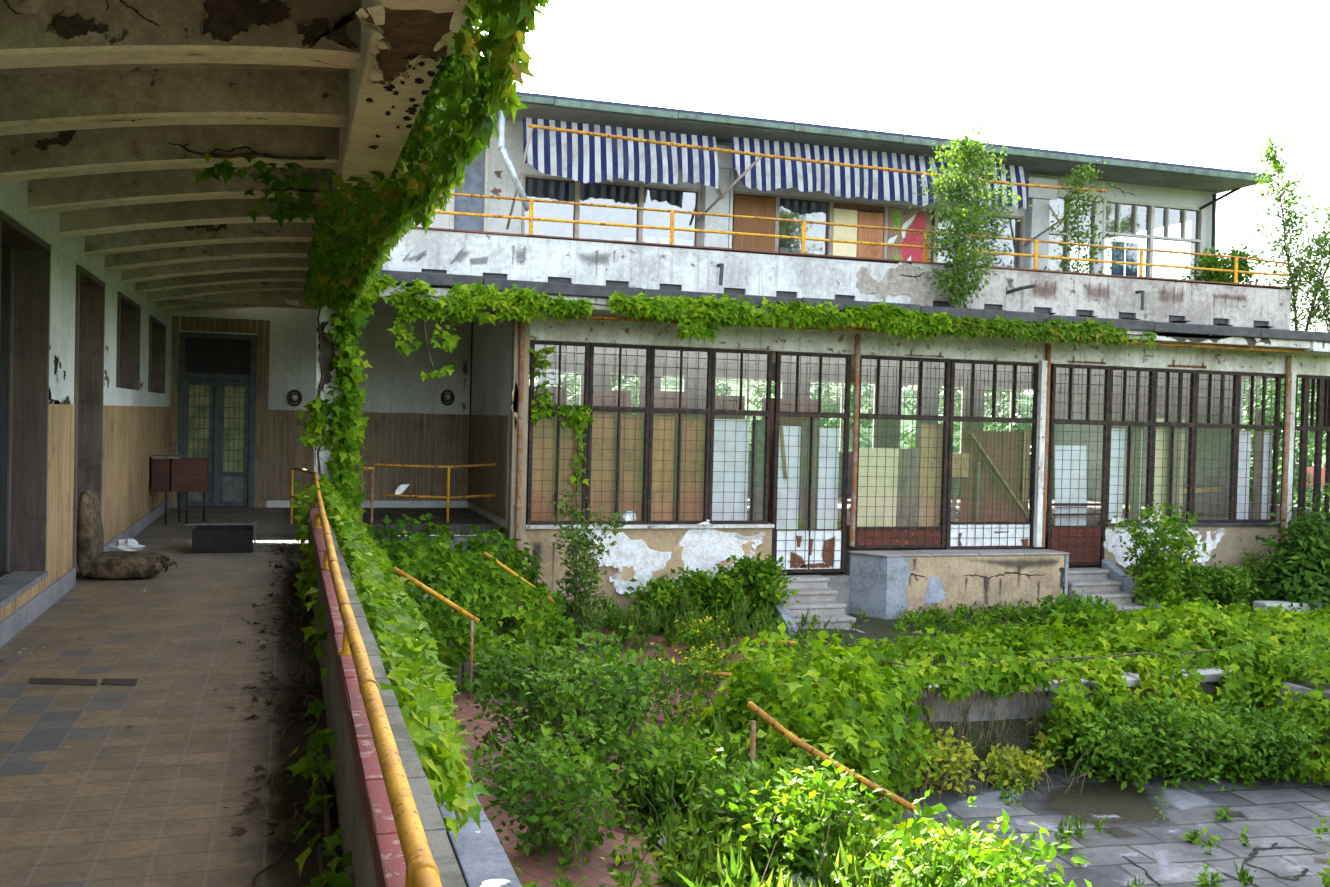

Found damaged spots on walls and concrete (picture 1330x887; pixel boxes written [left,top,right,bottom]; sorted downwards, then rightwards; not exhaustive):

flaking render [50,13,110,41]
spalling [200,0,468,129]
peeling [580,520,765,601]
crack [963,572,1045,592]